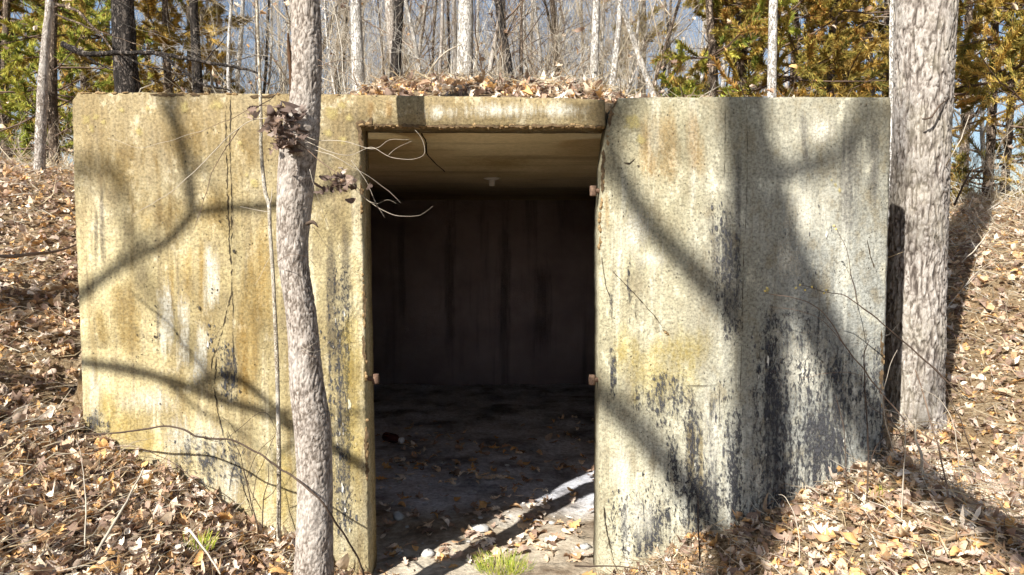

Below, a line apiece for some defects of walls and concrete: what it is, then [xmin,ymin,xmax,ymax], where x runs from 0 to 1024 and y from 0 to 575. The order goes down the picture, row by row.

crack [209,102,253,515]
leakage [781,347,825,388]
leakage [705,401,723,459]